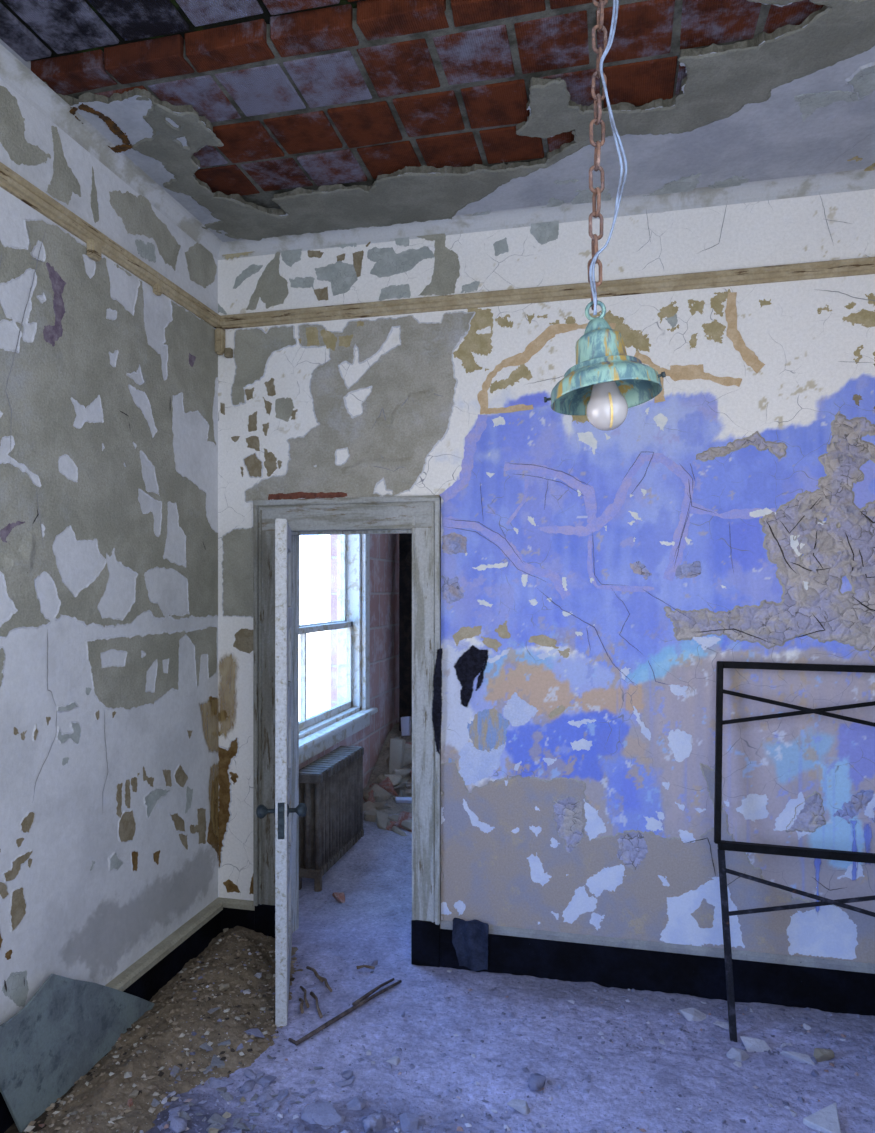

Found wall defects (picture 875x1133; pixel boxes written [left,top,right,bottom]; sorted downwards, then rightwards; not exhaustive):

spalling [0,0,875,310]
peeling [526,310,651,352]
peeling [657,289,731,349]
peeling [817,293,875,328]
spalling [572,415,611,455]
peeling [696,431,787,462]
peeling [0,219,533,766]
spalling [749,508,776,518]
peeling [528,634,570,658]
peeling [90,713,253,894]
peeling [441,692,875,964]
peeling [0,810,35,1007]